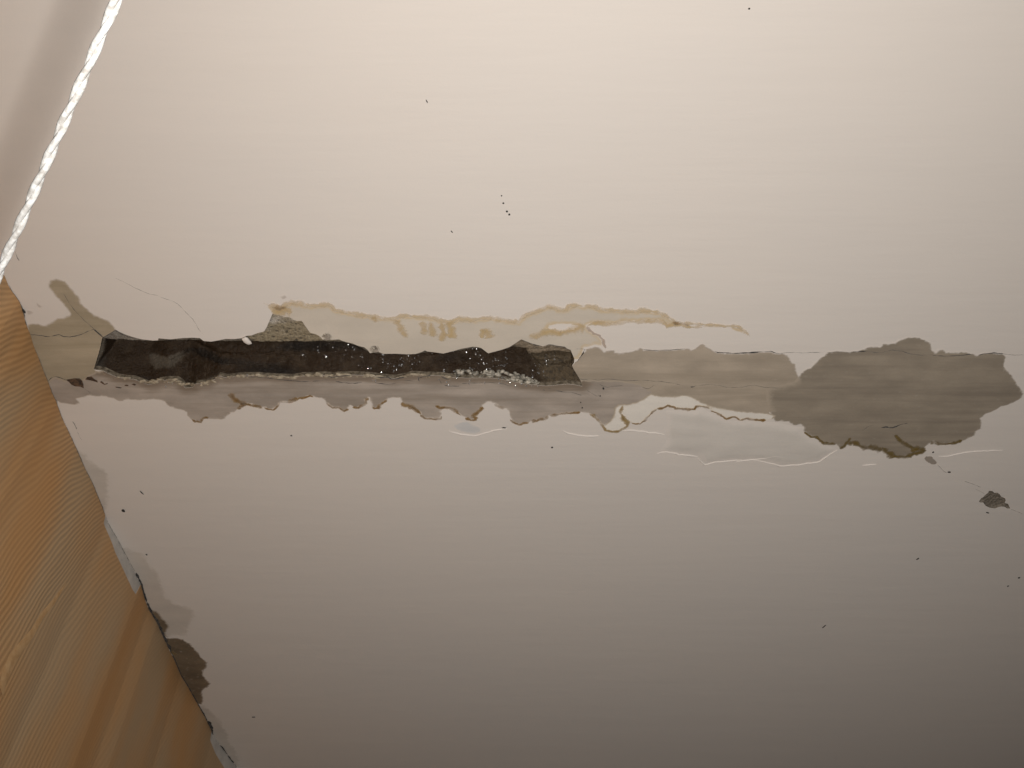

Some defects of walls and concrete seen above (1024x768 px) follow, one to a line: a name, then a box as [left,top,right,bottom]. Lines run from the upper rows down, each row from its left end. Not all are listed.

spalling [67,314,581,388]
spalling [979,491,1010,508]